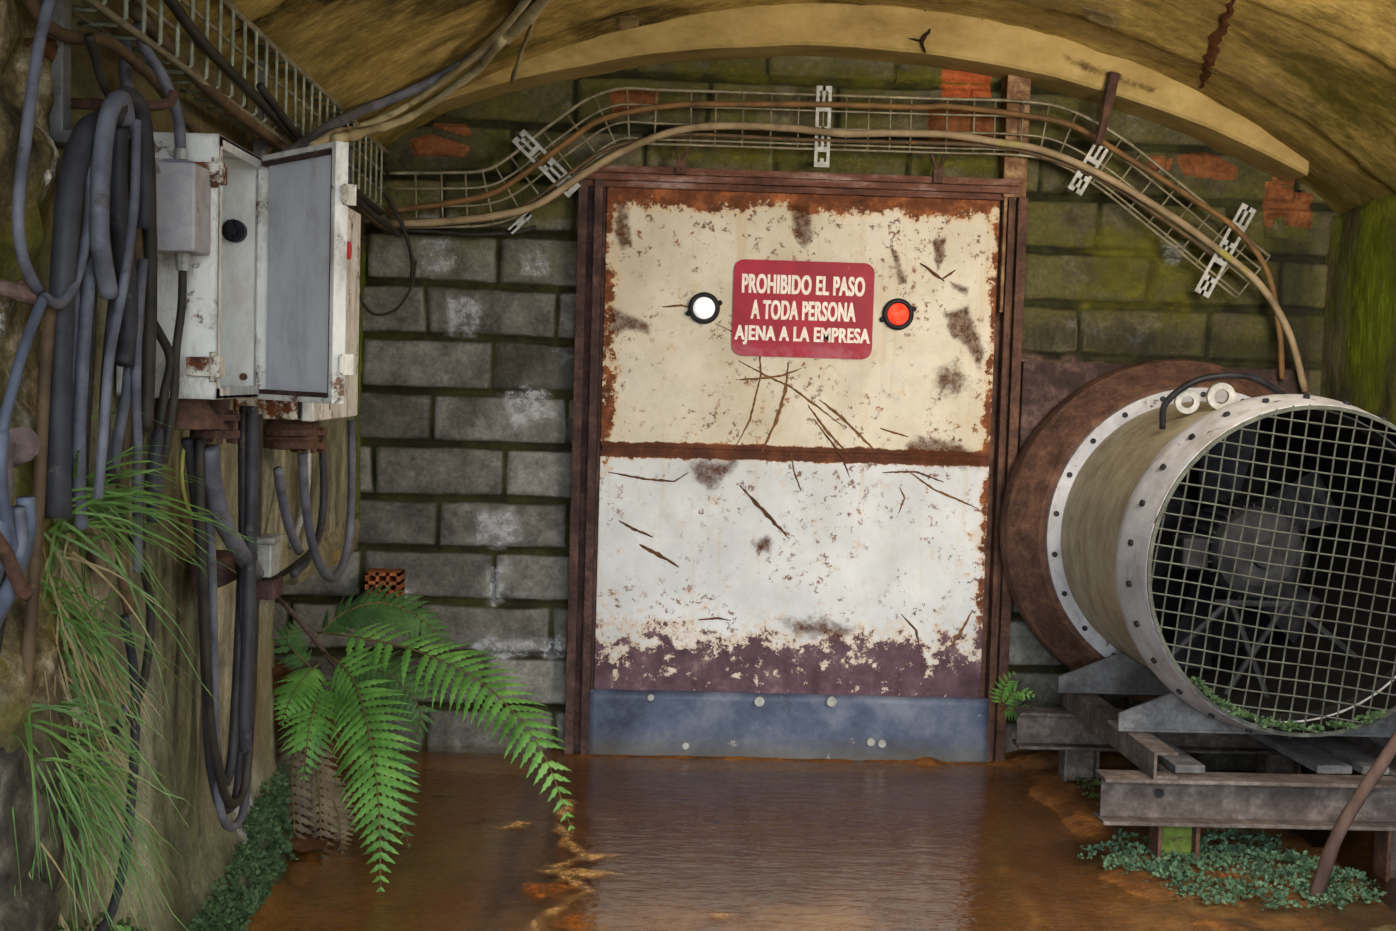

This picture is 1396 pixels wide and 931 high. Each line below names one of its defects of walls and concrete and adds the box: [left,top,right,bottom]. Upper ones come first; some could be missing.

crack [228,0,334,36]
crack [909,10,931,53]
flaking render [1262,176,1314,229]
corrosion [616,203,631,246]
corrosion [933,239,945,267]
water stain [448,299,479,334]
corrosion [611,310,648,332]
corrosion [946,284,983,363]
water stain [508,391,547,424]
corrosion [906,437,978,466]
water stain [479,512,517,546]
water stain [474,639,561,660]